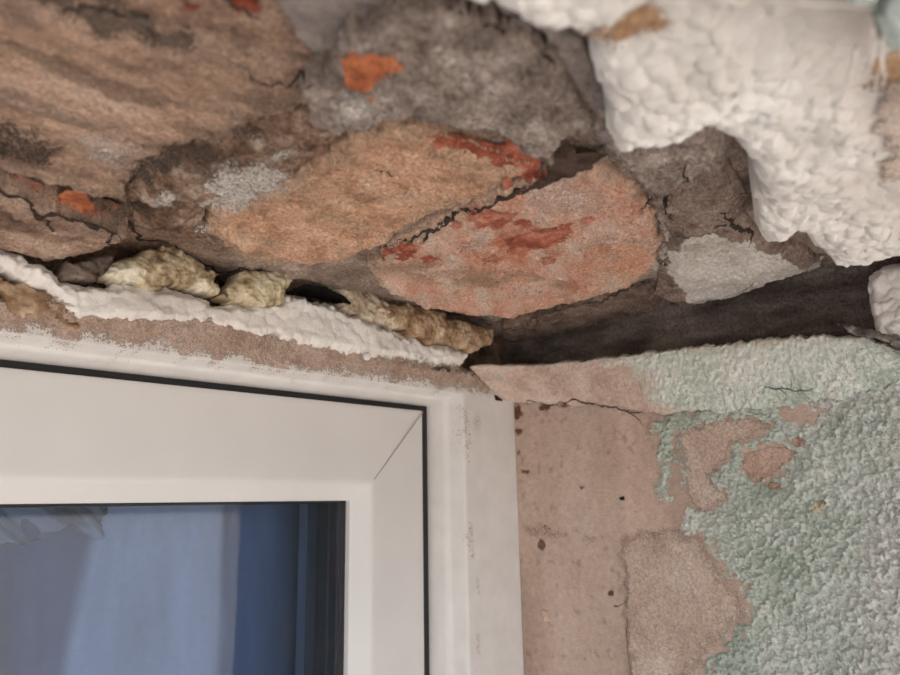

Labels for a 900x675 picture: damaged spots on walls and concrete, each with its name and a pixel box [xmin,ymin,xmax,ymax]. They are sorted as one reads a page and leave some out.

spalling [340,51,404,103]
spalling [427,134,548,190]
spalling [5,171,147,226]
crack [0,188,271,285]
crack [390,186,530,246]
crack [637,162,702,226]
crack [713,212,754,246]
crack [526,399,643,423]
peeling [677,417,770,514]
peeling [742,437,806,491]
peeling [608,528,745,675]